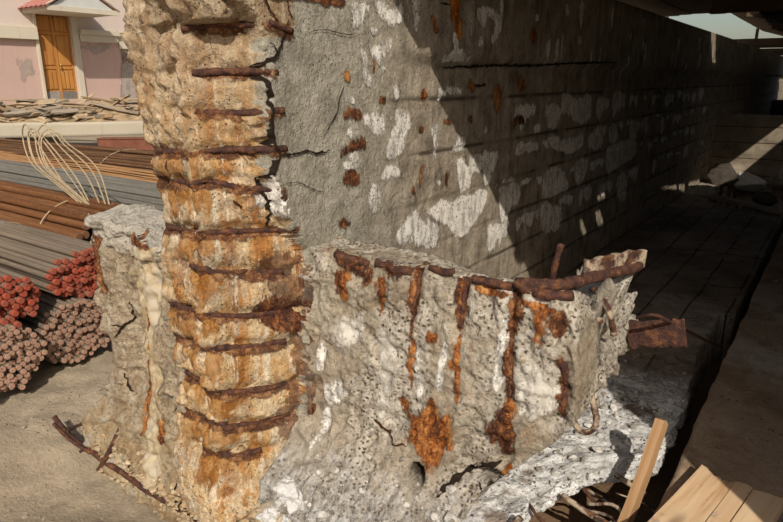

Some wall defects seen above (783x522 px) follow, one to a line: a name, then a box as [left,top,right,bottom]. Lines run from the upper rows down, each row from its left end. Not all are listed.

leakage [349,0,421,87]
crack [248,0,344,226]
leakage [363,85,412,213]
efflorescence [396,84,707,252]
crack [112,301,136,337]
corrosion [163,223,317,489]
corrosion [334,248,425,389]
spalling [333,251,575,329]
corrosion [448,273,570,475]
spalling [558,361,570,417]
spalling [52,415,187,517]
crack [436,460,502,498]